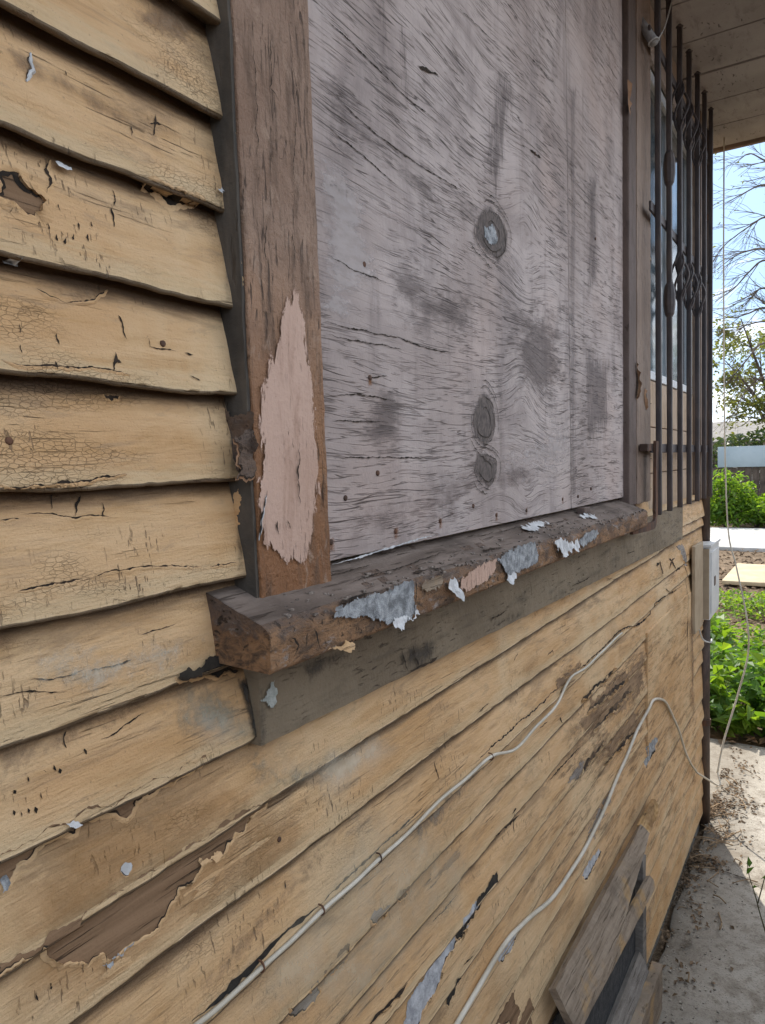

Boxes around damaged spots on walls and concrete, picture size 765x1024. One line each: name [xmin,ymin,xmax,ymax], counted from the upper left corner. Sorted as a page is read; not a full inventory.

peeling [0,155,93,244]
crack [1,288,199,380]
peeling [225,289,321,565]
crack [18,562,236,594]
peeling [334,542,539,631]
peeling [555,513,599,557]
crack [551,550,689,788]
crack [496,808,518,836]
peeling [0,797,271,977]
peeling [404,901,483,1024]